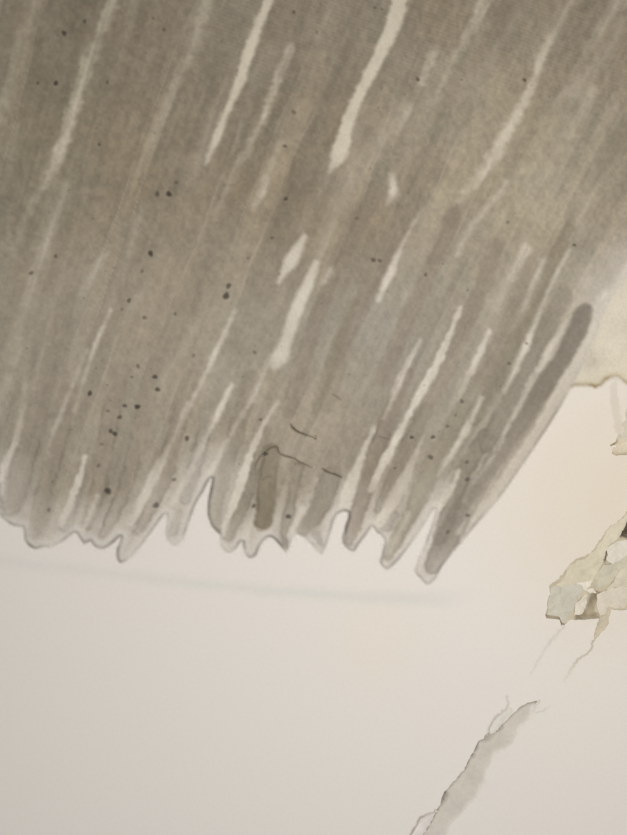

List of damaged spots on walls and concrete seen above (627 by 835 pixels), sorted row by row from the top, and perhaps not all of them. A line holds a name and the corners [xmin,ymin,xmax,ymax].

damp [0,0,627,611]
spalling [545,511,627,640]
crack [562,639,596,684]
crack [408,695,551,835]